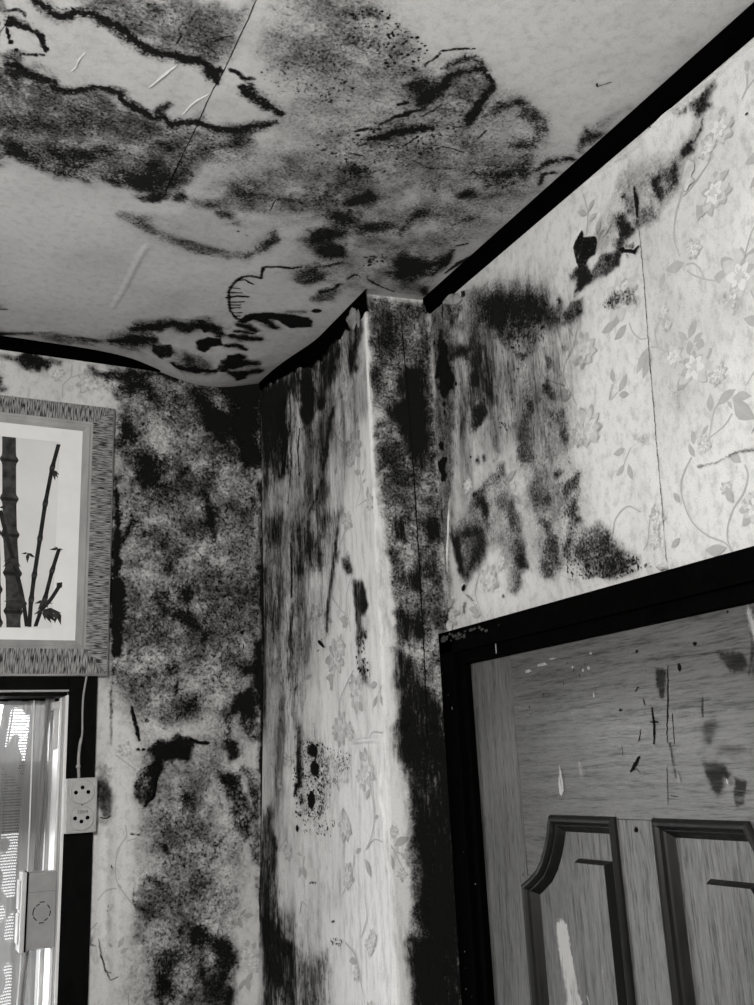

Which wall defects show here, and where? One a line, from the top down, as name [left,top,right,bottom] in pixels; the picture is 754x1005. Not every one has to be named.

leakage [0,0,577,1005]
leakage [362,281,651,1005]
leakage [577,123,604,152]
leakage [607,82,716,258]